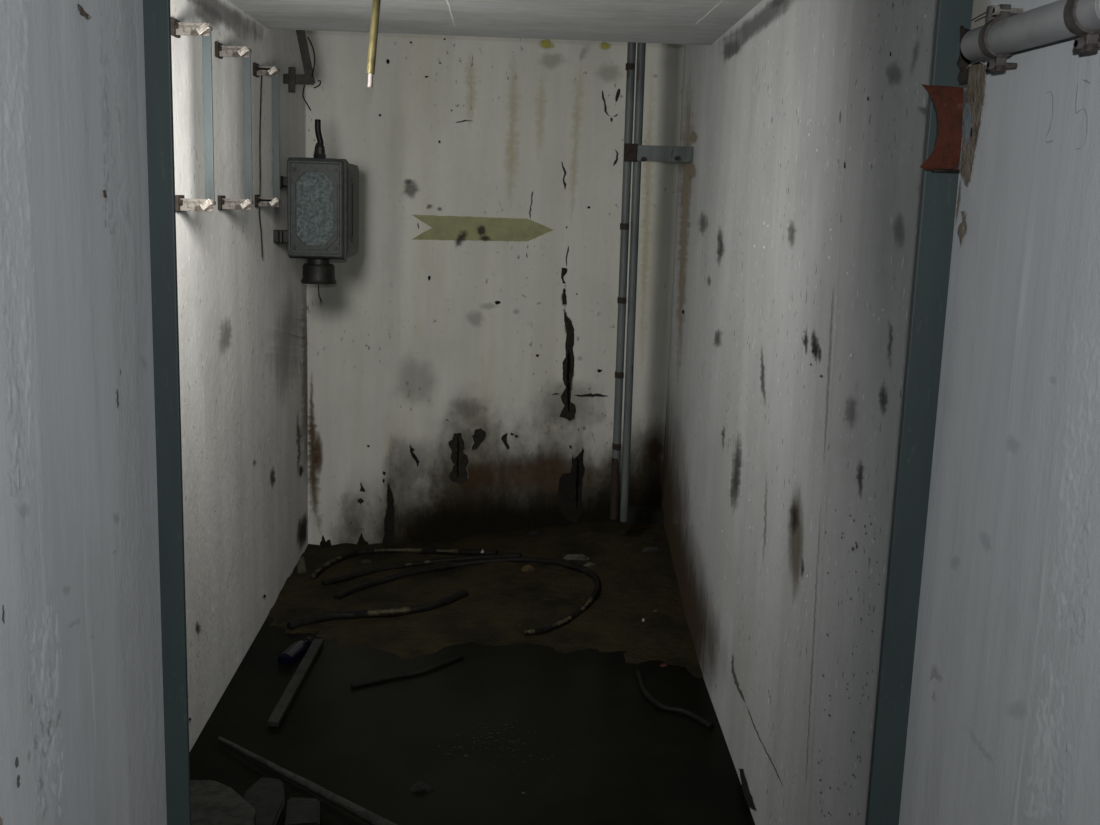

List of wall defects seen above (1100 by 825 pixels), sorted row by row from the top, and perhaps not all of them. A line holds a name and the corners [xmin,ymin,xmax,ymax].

flaking render [957,25,987,187]
flaking render [957,211,967,245]
peeling [559,268,578,422]
rust [304,328,322,507]
peeling [448,428,487,484]
damp [341,434,664,544]
damp [731,451,740,499]